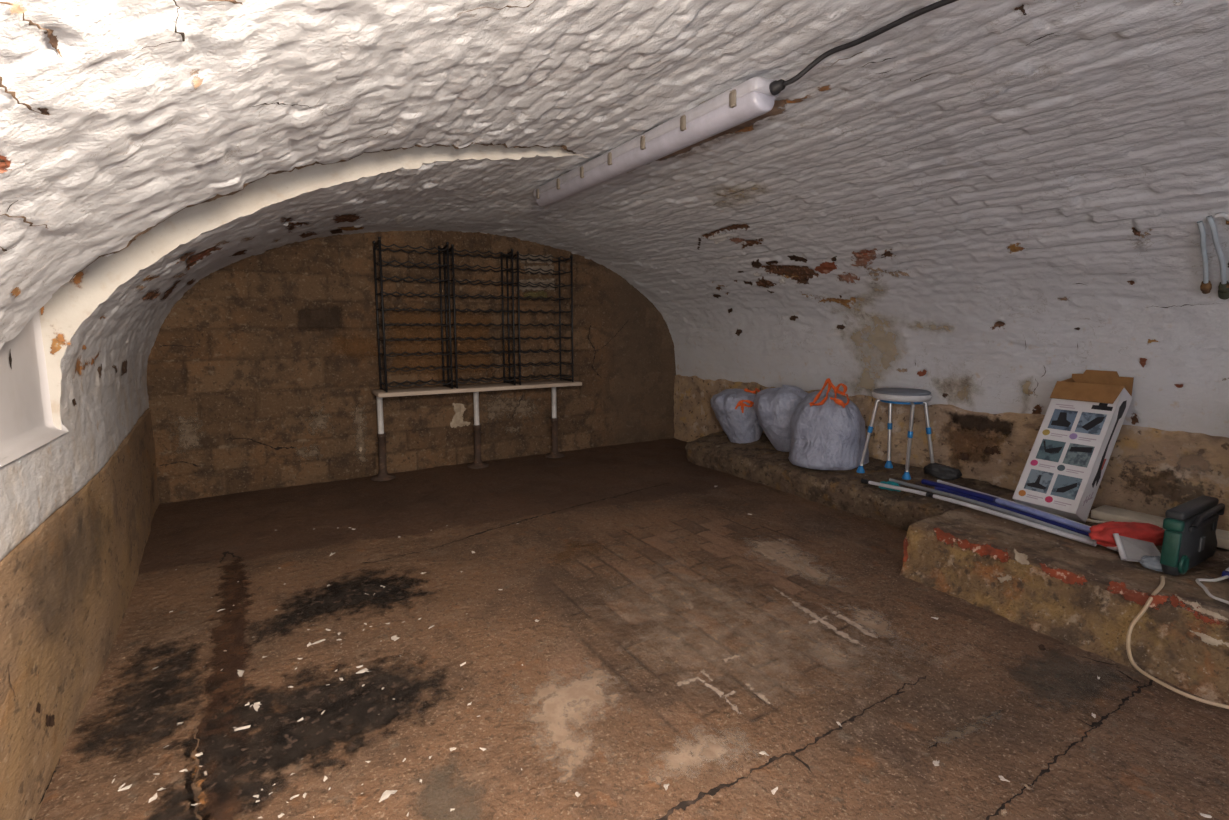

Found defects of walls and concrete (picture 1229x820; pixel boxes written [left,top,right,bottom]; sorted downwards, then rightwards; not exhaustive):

crack [0,1,64,60]
crack [140,0,185,50]
spalling [0,156,12,173]
spalling [271,214,367,243]
spalling [135,236,255,301]
spalling [697,224,910,313]
water stain [942,412,1012,469]
water stain [296,580,409,616]
water stain [198,733,243,803]
water stain [260,688,415,766]
crack [656,676,926,820]
crack [986,657,1156,820]